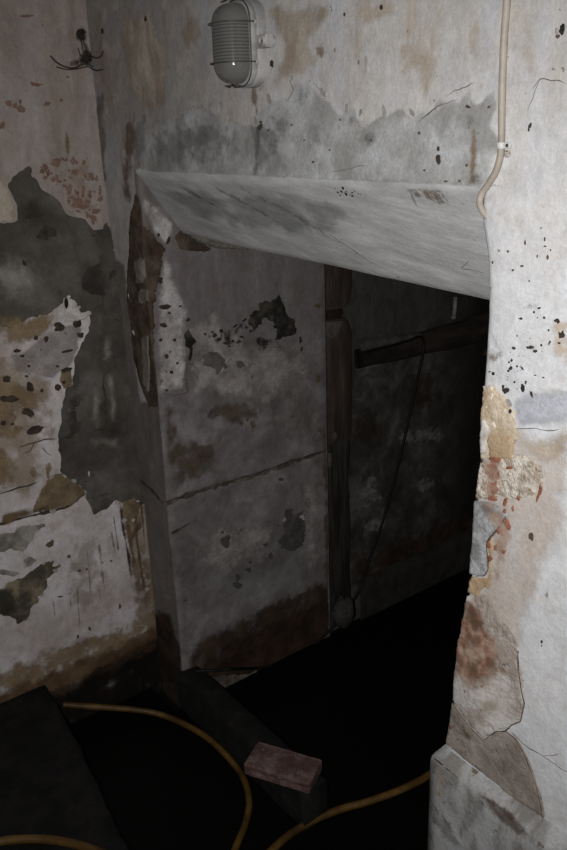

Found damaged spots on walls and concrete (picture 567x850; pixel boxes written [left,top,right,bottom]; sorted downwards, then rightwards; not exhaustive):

leakage [0,261,214,726]
flaking render [0,156,320,624]
crack [140,450,327,508]
leakage [191,585,329,677]
crack [451,654,566,821]
peeling [468,385,562,638]